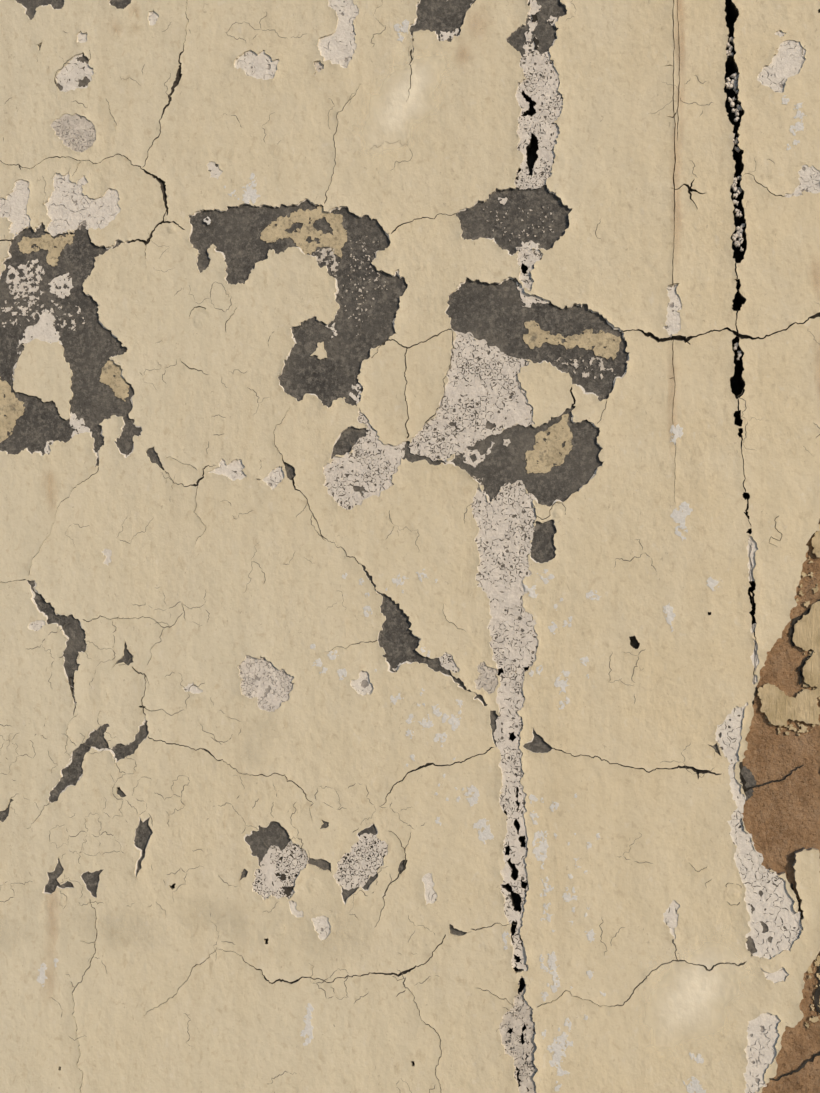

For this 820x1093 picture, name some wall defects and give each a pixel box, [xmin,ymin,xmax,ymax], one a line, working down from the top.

crack [0,8,237,331]
peeling [27,580,87,706]
peeling [0,172,164,470]
peeling [48,717,149,803]
crack [0,593,494,1093]
crack [140,342,361,589]
peeling [189,0,630,1093]
crack [553,746,721,779]
crack [622,301,820,494]
spalling [709,519,820,983]
crack [540,940,747,1007]
spalling [743,952,820,1093]